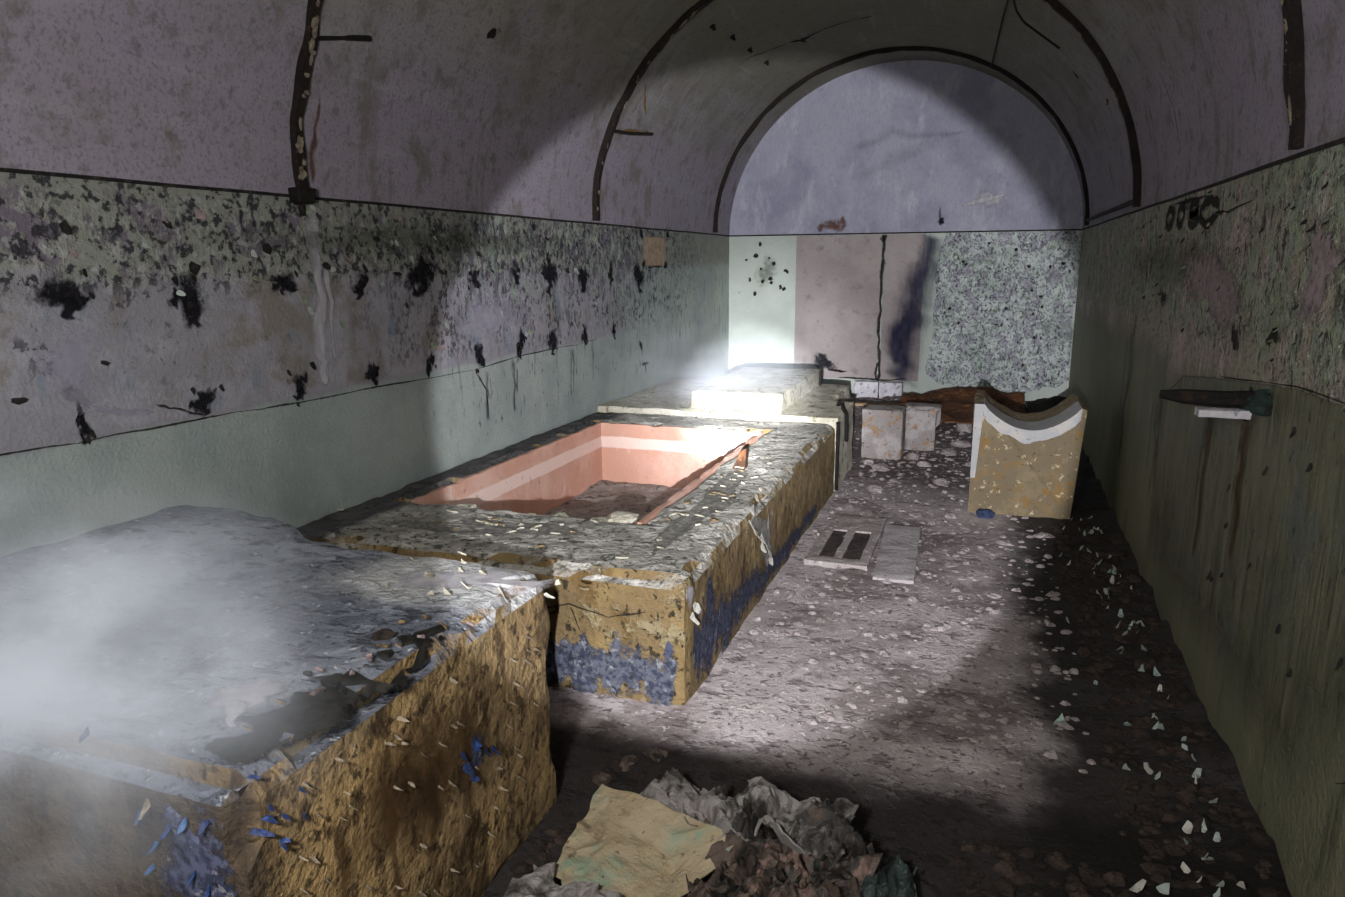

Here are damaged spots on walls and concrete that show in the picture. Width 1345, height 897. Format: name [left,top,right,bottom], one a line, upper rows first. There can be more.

peeling [58,219,101,299]
peeling [171,261,201,296]
peeling [251,243,272,258]
damp [306,204,336,385]
peeling [322,236,414,289]
spalling [651,455,773,566]
spalling [688,587,702,625]